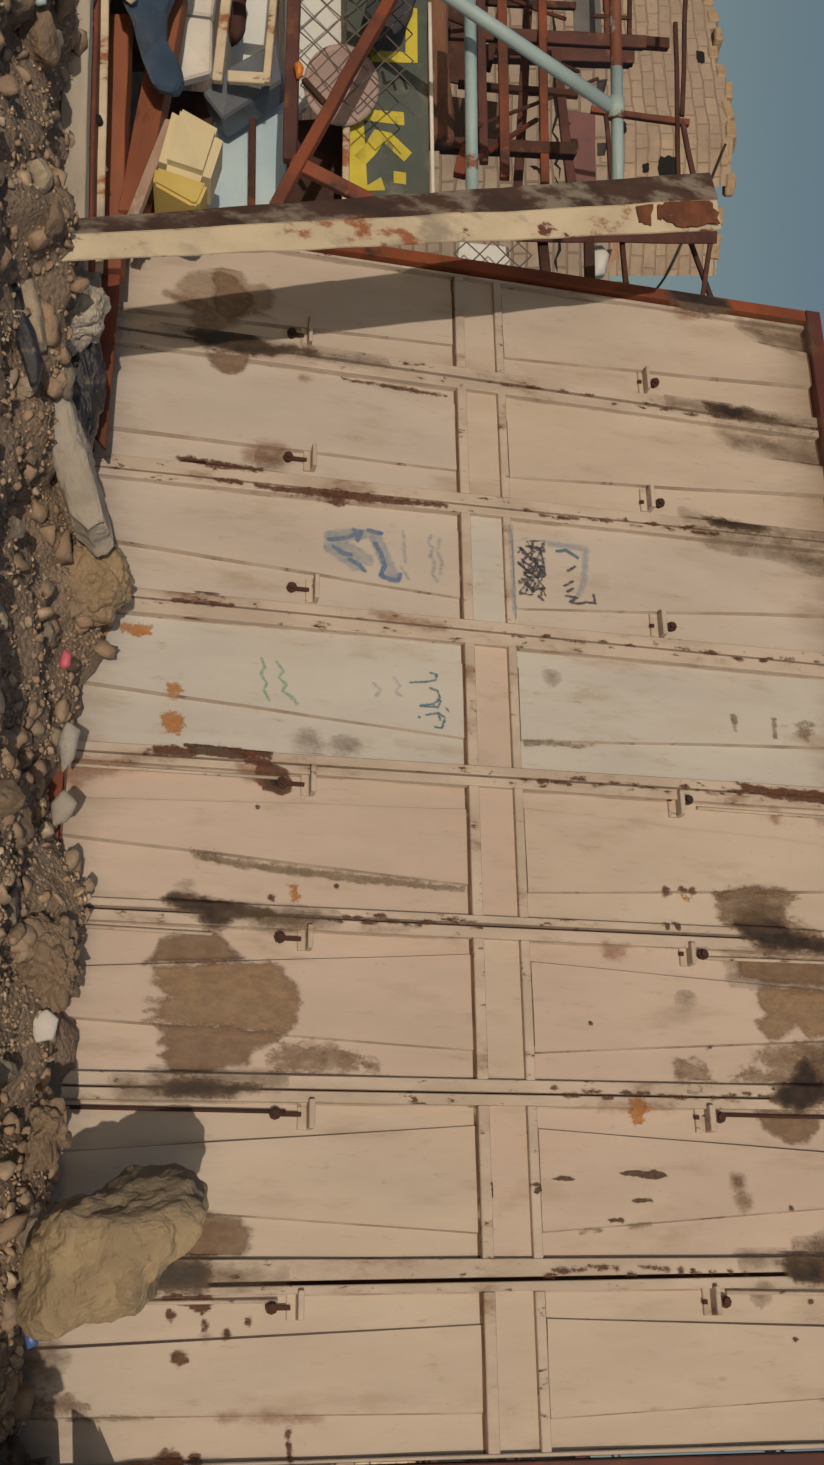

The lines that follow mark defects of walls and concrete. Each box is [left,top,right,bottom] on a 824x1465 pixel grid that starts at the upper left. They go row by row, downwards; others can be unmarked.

corrosion [72,173,720,234]
leakage [165,268,272,374]
corrosion [176,449,448,508]
corrosion [255,762,292,795]
leakage [144,934,379,1078]
leakage [713,886,824,1145]
leakage [185,1213,249,1259]